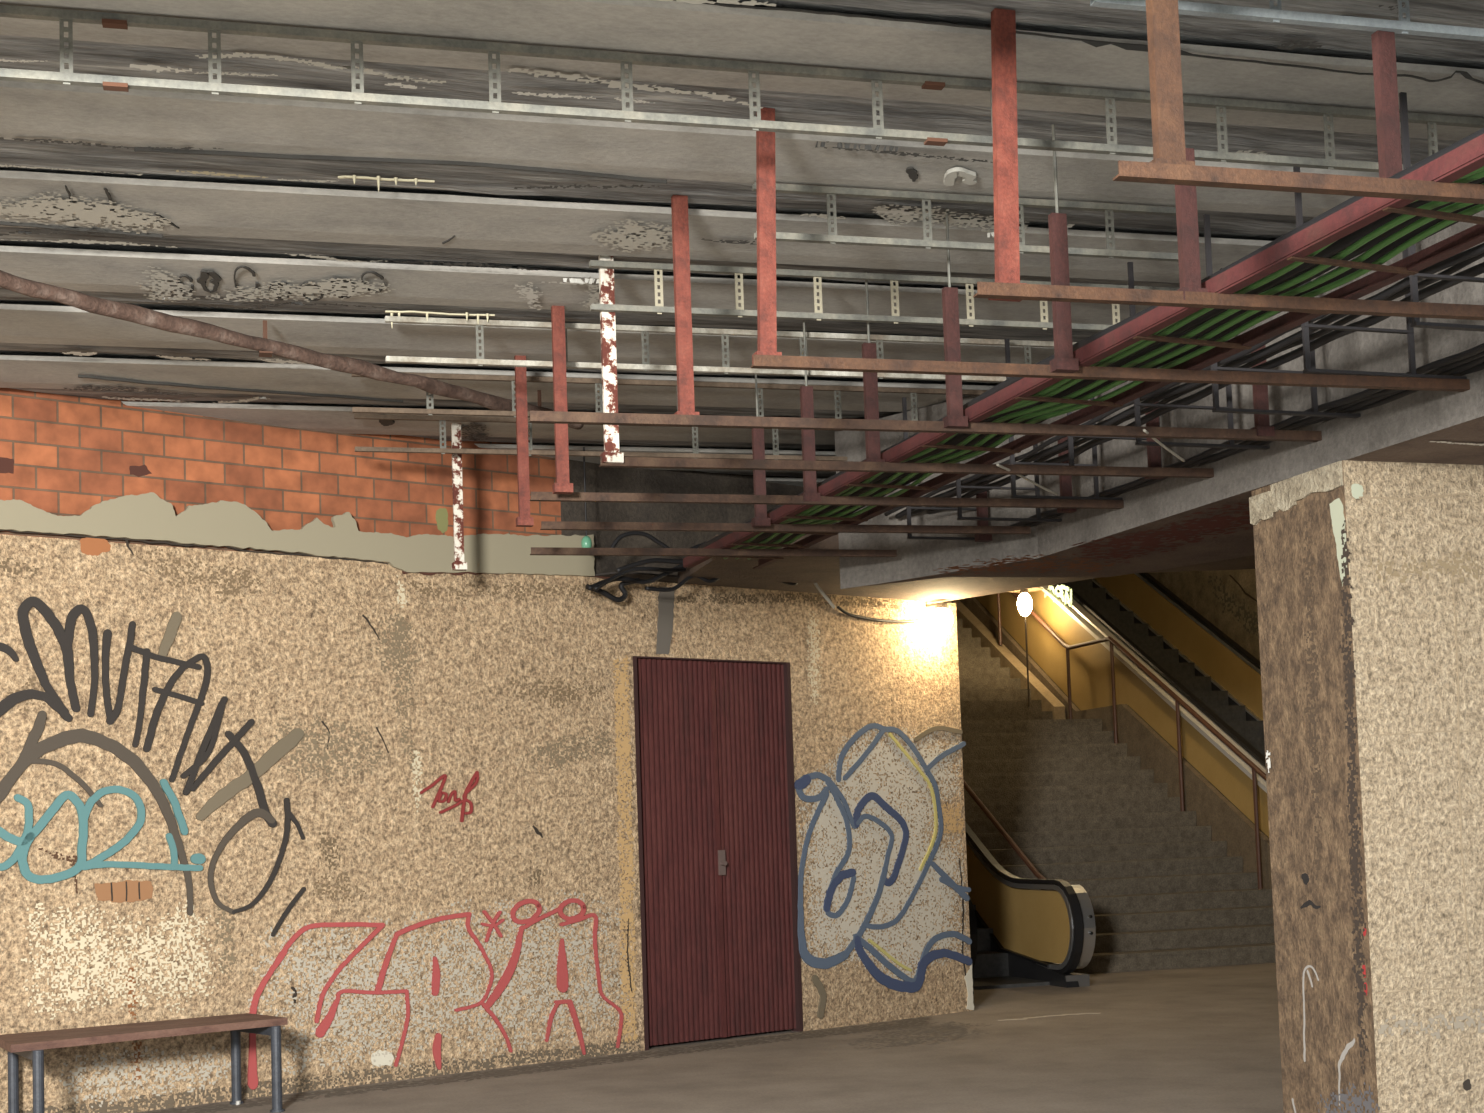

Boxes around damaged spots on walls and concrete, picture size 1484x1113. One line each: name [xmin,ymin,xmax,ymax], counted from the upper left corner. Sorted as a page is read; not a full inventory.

crack [675,0,1484,84]
flaking render [0,388,595,577]
crack [1430,439,1484,447]